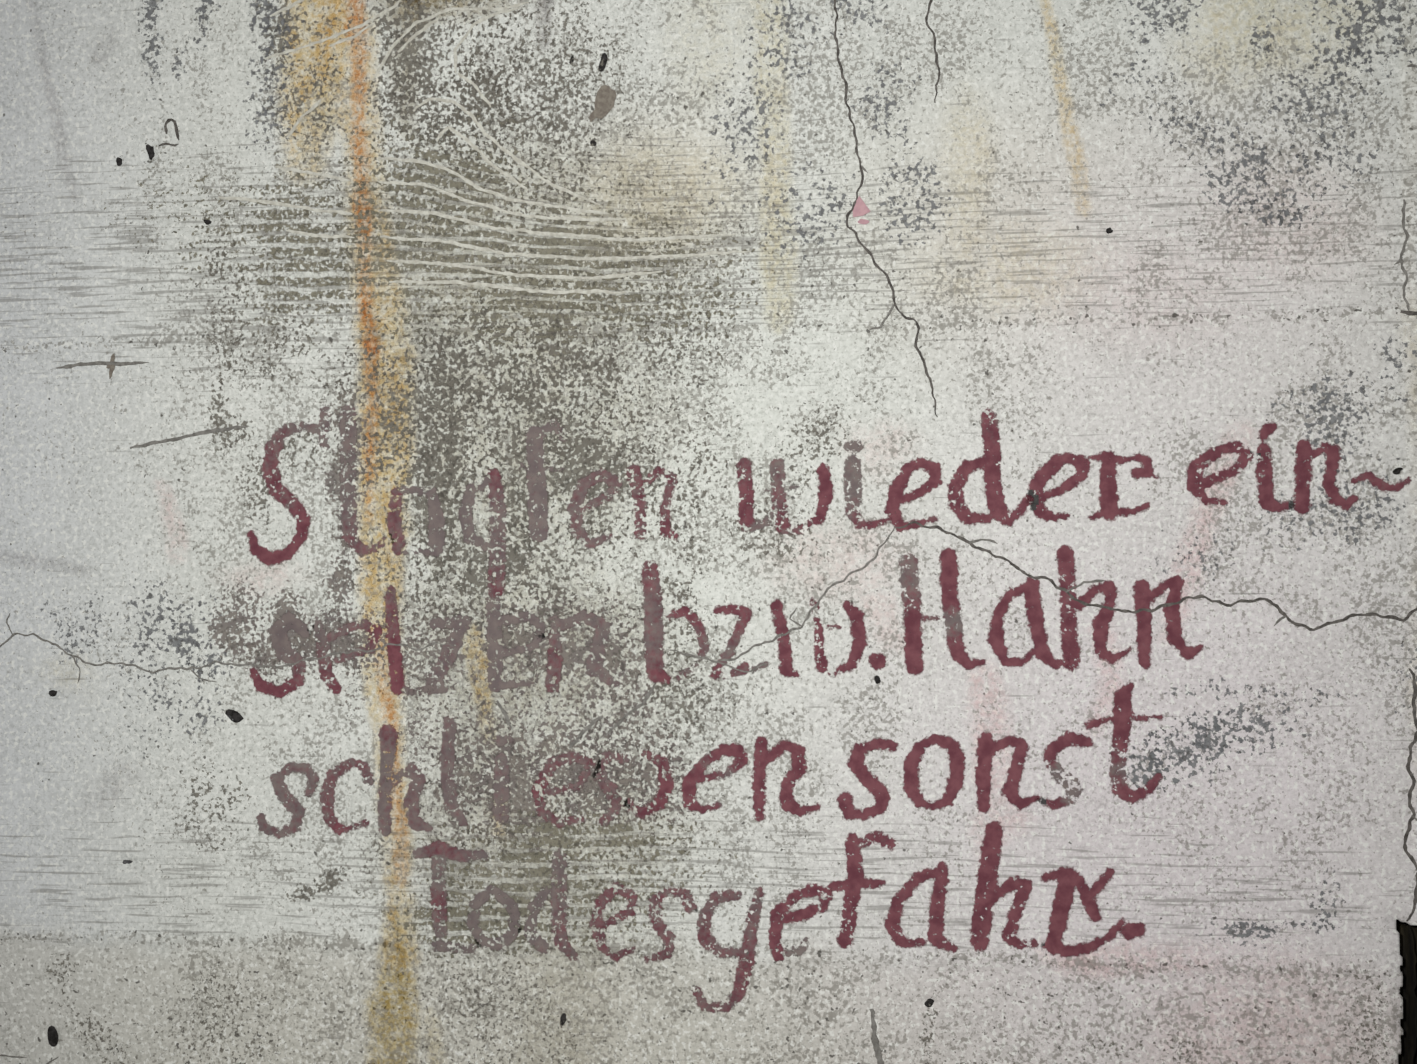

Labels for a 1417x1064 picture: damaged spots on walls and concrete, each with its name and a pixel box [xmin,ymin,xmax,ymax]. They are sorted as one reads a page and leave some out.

crack [833,0,940,417]
crack [0,613,455,684]
crack [669,521,1417,673]
crack [1403,668,1417,921]